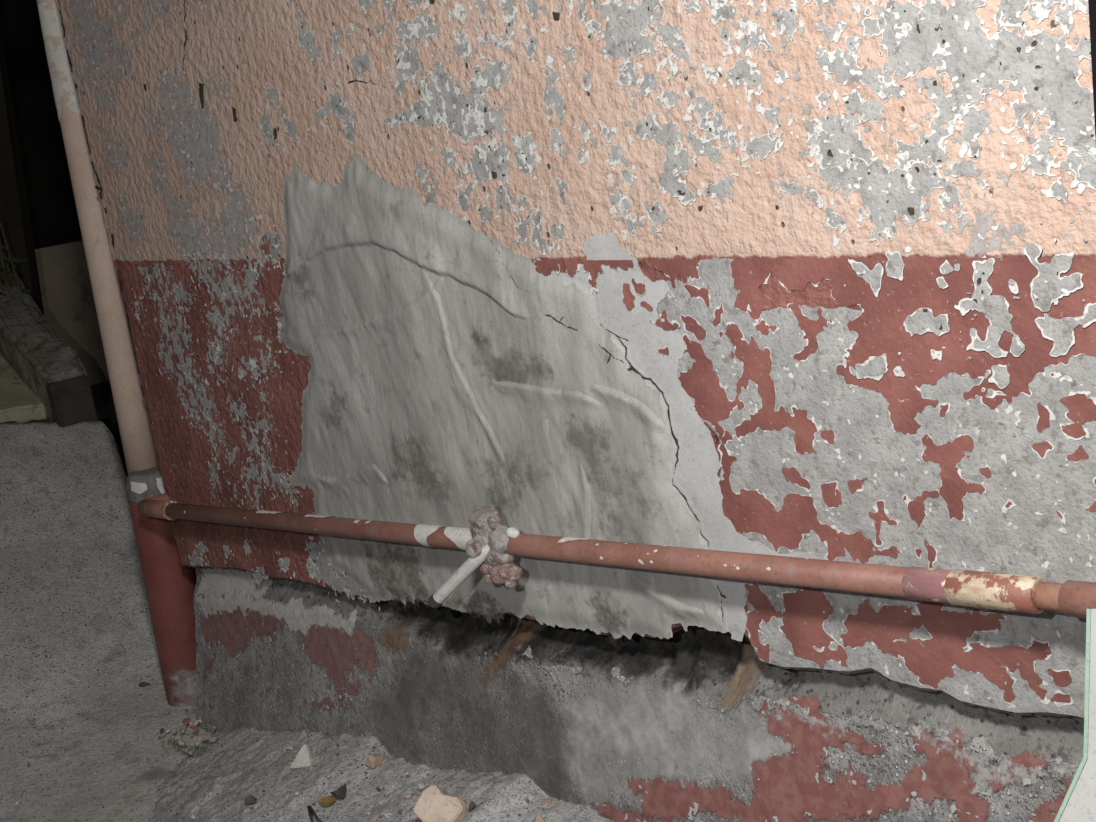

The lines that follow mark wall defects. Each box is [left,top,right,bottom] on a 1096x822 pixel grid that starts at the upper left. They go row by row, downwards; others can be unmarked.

peeling [131,214,303,512]
crack [543,313,709,545]
peeling [251,0,1096,584]
spalling [182,535,1086,822]